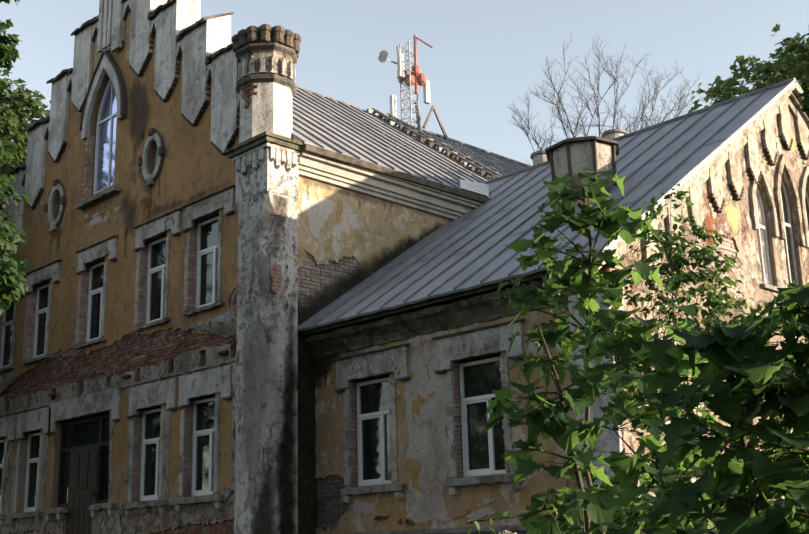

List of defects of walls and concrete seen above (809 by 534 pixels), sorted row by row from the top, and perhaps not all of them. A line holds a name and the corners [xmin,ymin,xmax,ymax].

flaking render [297,189,420,307]